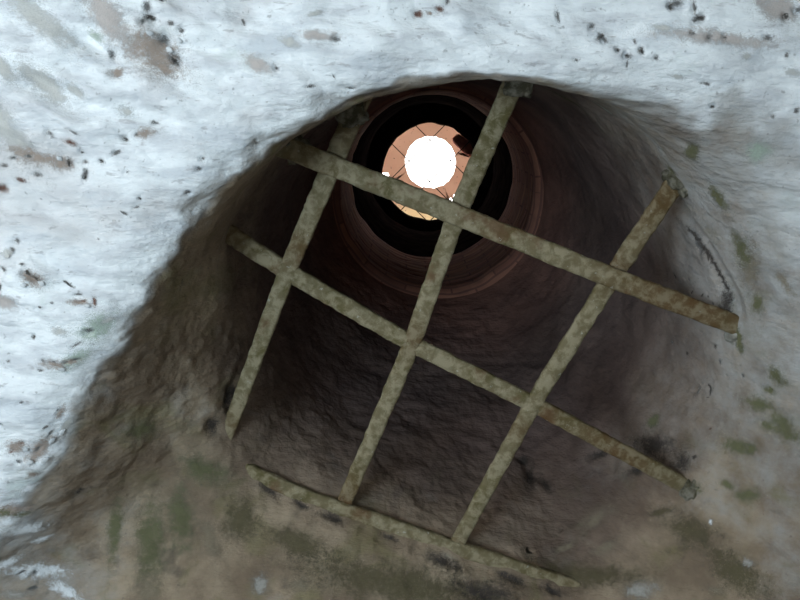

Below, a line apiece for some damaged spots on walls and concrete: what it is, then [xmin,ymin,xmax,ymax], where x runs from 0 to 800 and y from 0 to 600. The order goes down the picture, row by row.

crack [680,220,746,358]